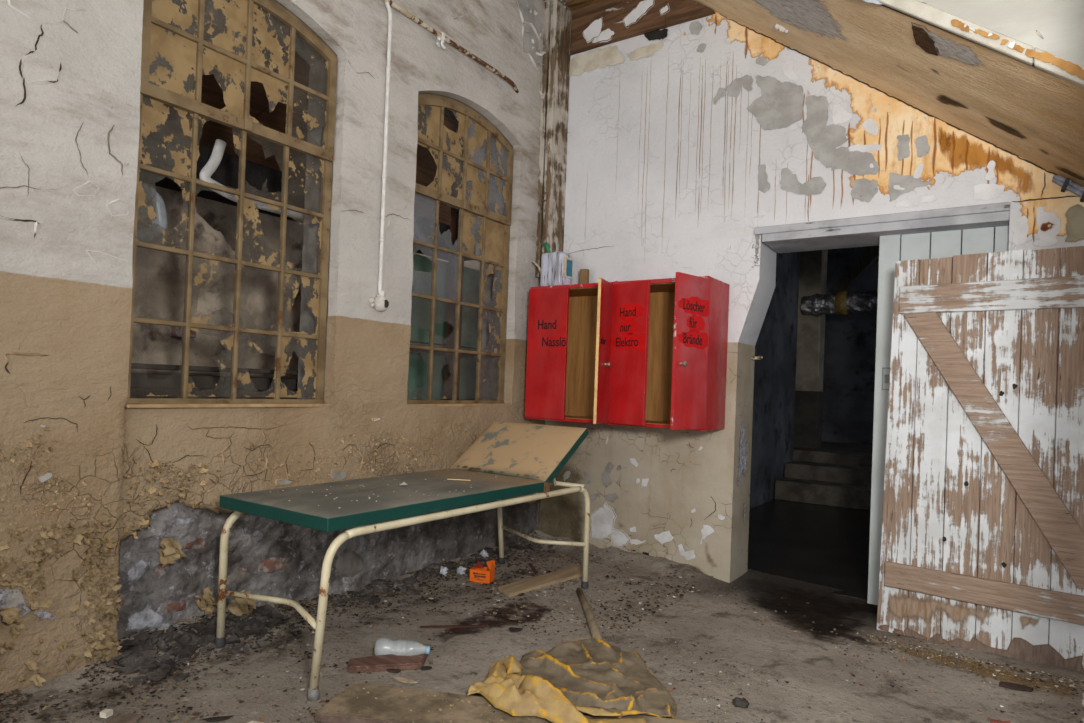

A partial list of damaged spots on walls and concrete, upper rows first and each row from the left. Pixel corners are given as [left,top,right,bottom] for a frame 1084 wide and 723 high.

peeling [16,24,62,106]
peeling [569,41,666,77]
crack [75,122,88,174]
crack [107,124,129,176]
peeling [712,57,931,202]
crack [0,155,58,238]
peeling [1011,206,1061,246]
crack [23,386,111,434]
crack [19,461,32,496]
crack [135,422,400,483]
peeling [563,458,725,560]
spalling [0,423,541,673]